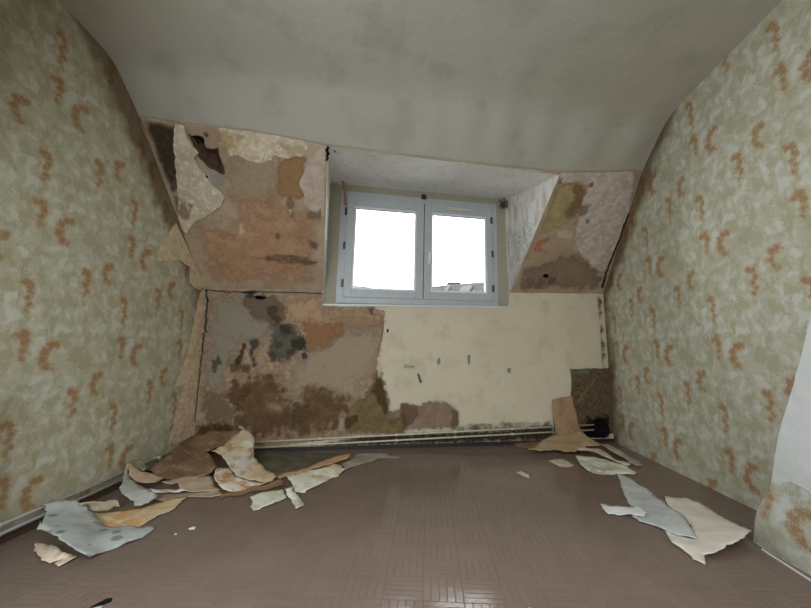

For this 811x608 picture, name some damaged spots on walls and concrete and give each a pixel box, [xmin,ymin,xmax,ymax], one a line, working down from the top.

peeling [218,128,326,219]
peeling [556,171,634,272]
peeling [158,223,385,447]
peeling [570,368,613,434]
flaking render [771,316,811,494]